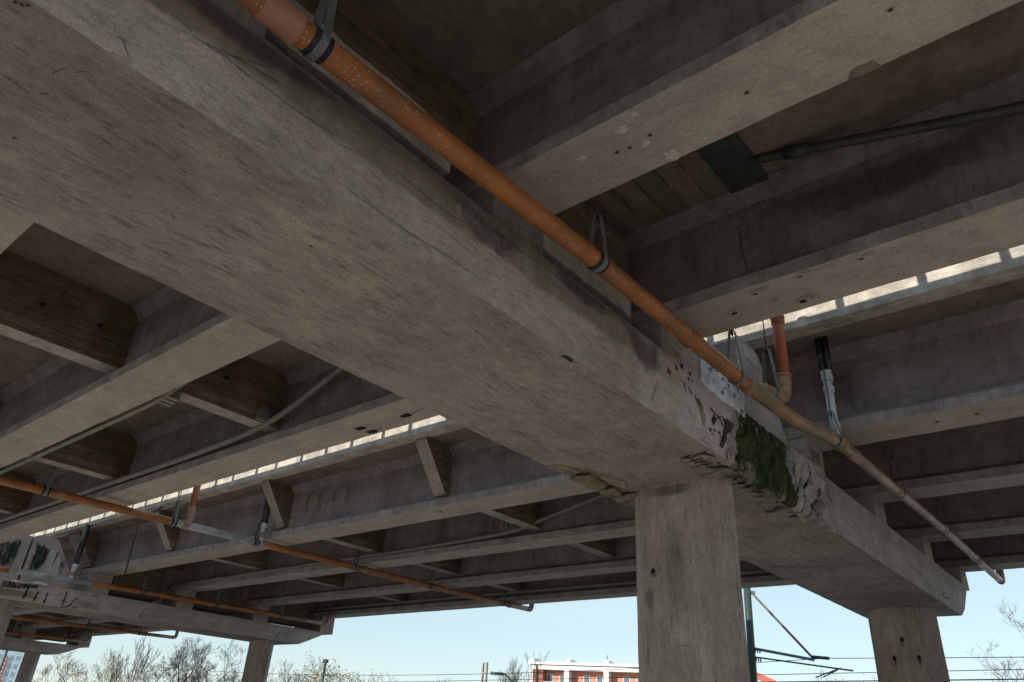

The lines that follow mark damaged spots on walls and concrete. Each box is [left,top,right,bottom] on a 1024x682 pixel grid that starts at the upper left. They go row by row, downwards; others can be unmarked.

spalling [547,464,637,508]
spalling [680,407,838,534]